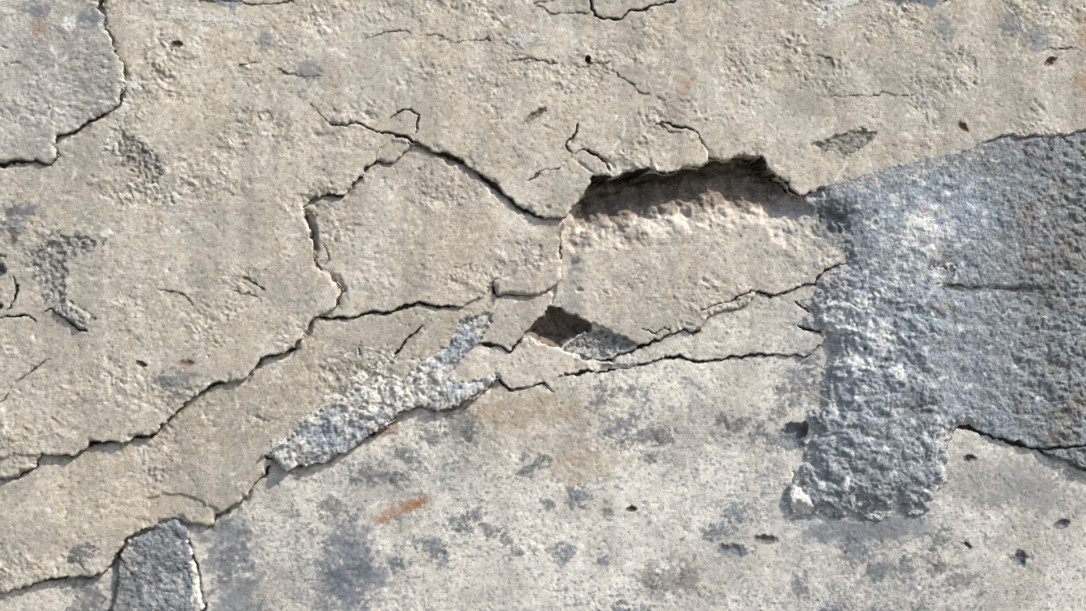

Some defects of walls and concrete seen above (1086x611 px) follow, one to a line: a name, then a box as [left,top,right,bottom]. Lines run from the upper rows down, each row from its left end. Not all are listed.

flaking render [0,0,124,165]
crack [0,0,126,168]
spalling [107,128,165,185]
crack [534,0,676,21]
spalling [813,126,876,159]
crack [0,57,812,479]
spalling [524,158,846,360]
spalling [0,283,504,593]
crack [188,263,846,575]
crack [949,424,1086,470]
crack [13,525,156,590]
peeling [186,540,209,611]